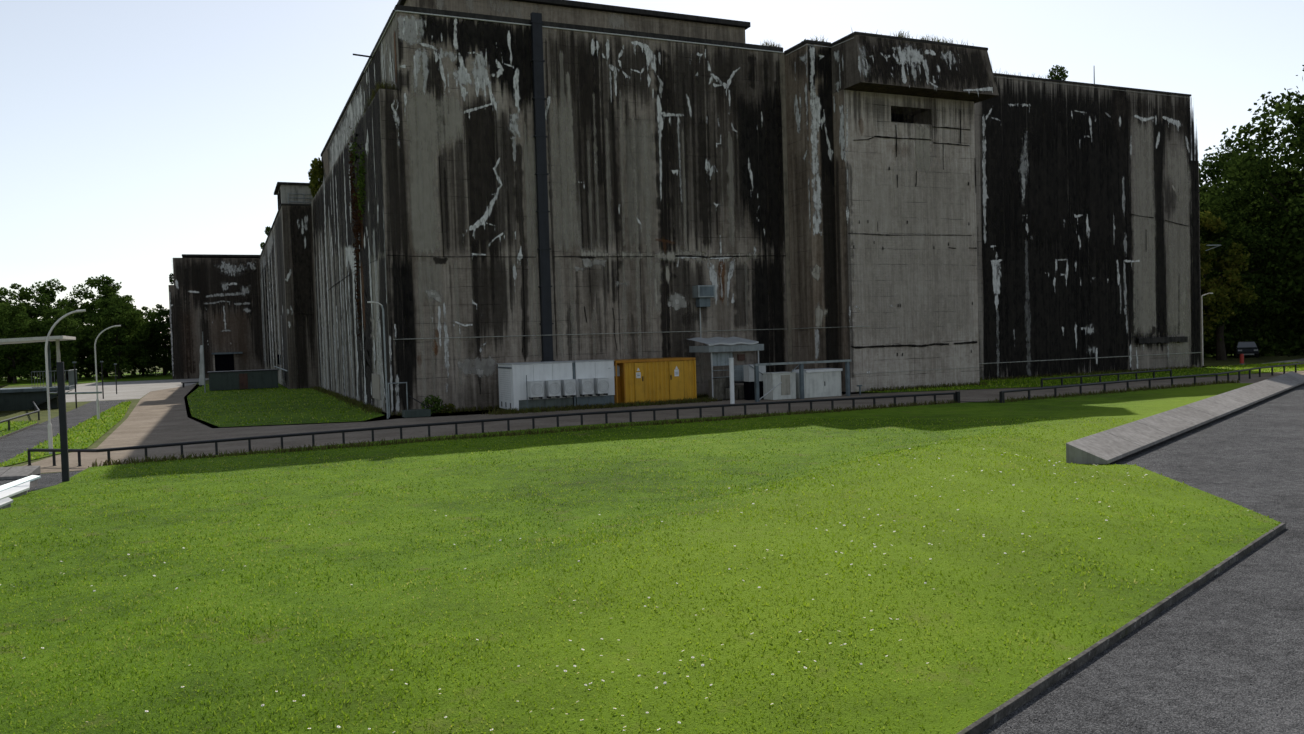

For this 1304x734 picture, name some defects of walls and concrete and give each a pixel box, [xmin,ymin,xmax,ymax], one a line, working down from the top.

peeling [566,73,576,191]
leakage [169,14,1201,415]
peeling [575,249,757,312]